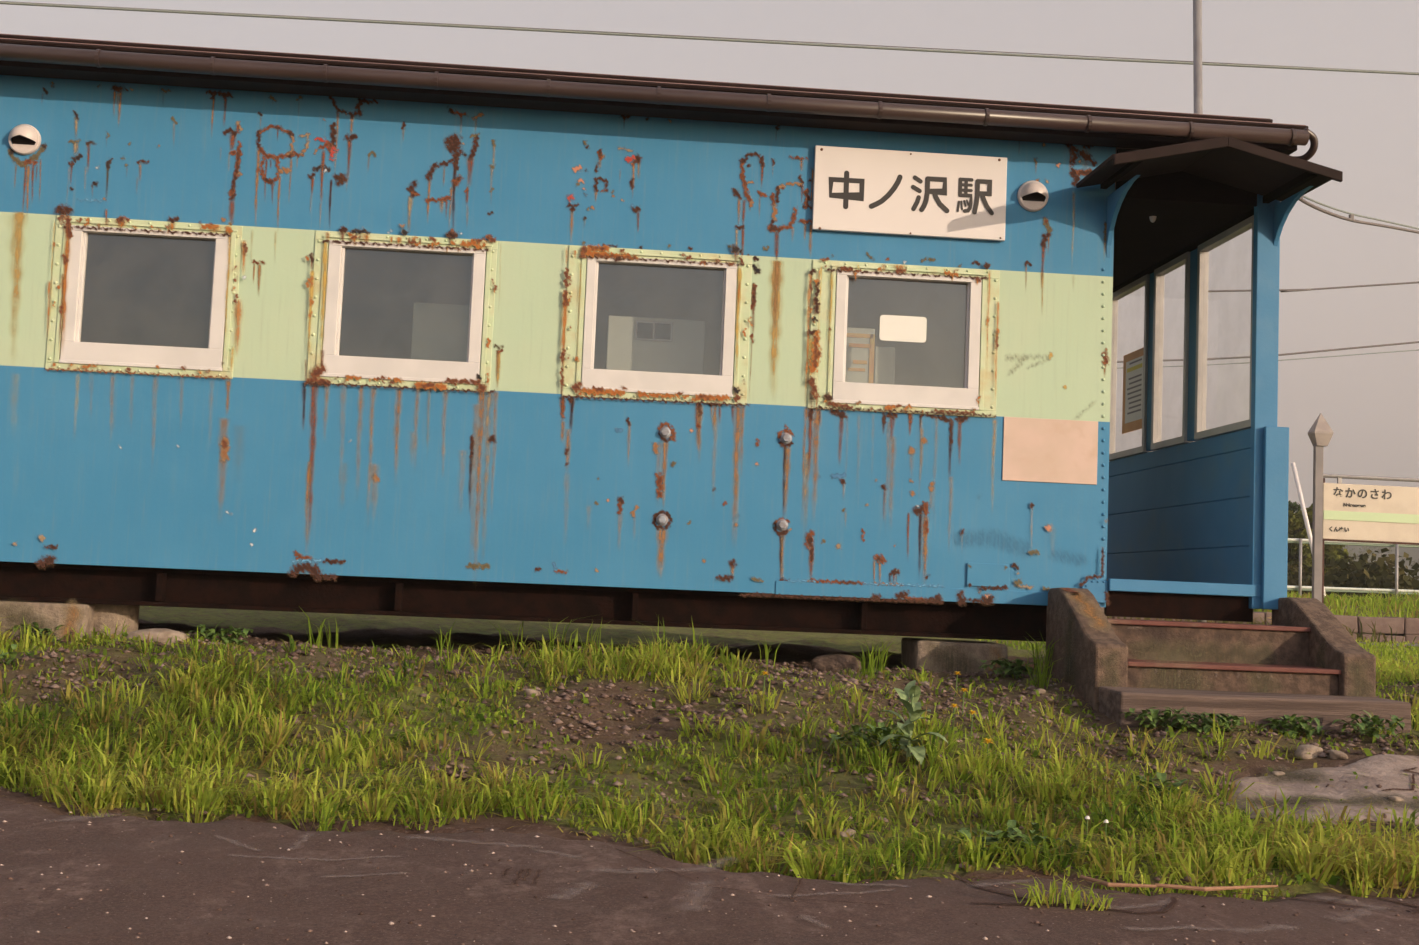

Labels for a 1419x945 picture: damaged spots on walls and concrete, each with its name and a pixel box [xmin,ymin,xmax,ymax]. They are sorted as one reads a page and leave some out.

corrosion [8,144,47,312]
corrosion [45,90,504,530]
corrosion [559,148,1008,606]
corrosion [1041,217,1052,303]
corrosion [37,544,58,568]
corrosion [288,550,346,581]